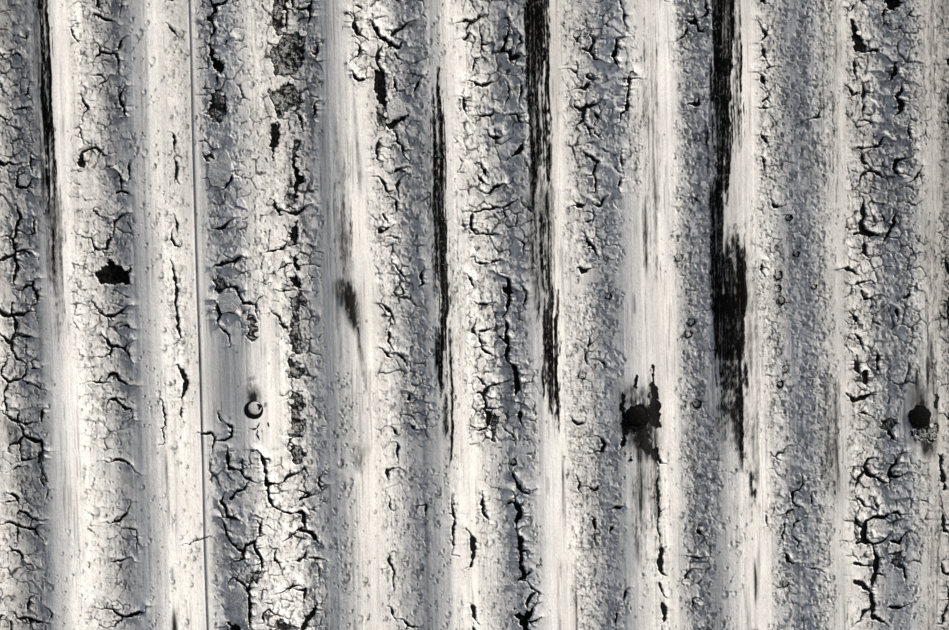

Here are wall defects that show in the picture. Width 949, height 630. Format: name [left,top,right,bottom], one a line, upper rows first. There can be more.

peeling [266,0,307,379]
crack [568,0,637,274]
peeling [91,255,131,286]
peeling [227,571,263,630]
crack [182,403,327,630]
peeling [270,619,292,630]
peeling [287,391,308,465]
crack [451,469,540,625]
crack [468,259,527,445]
corrosion [623,385,657,513]
crack [842,61,922,627]
corrosion [911,340,938,457]